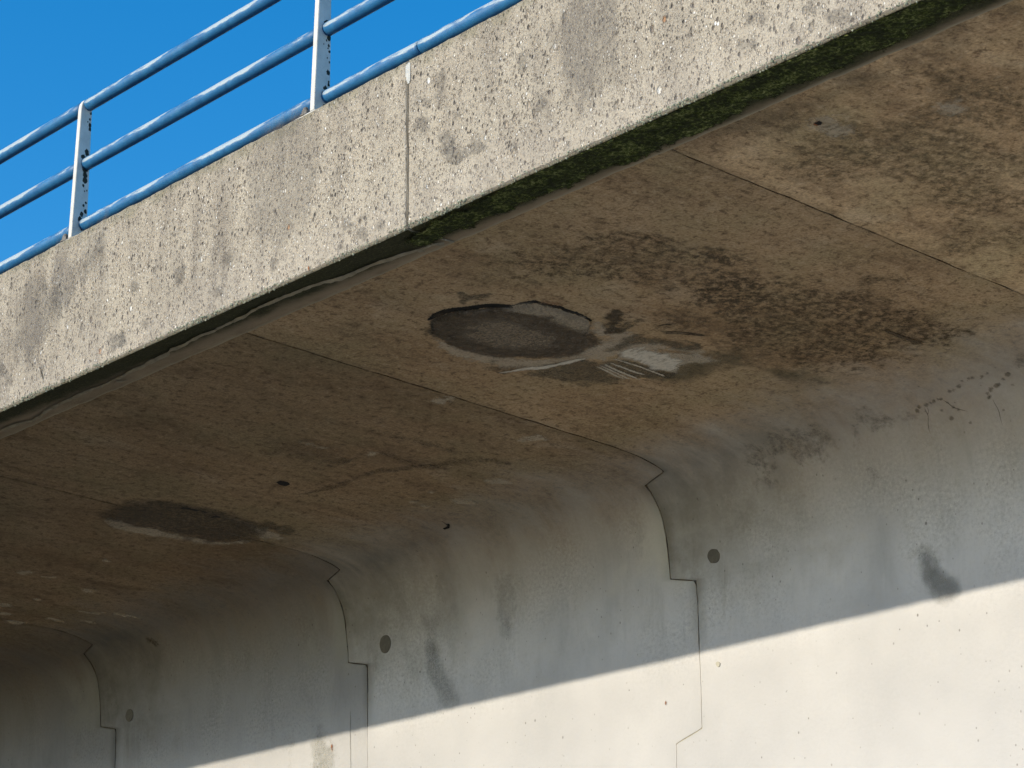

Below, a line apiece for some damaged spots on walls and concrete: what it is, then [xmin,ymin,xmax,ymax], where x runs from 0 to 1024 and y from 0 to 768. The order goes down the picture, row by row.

peeling [427,300,637,386]
water stain [509,231,973,379]
water stain [104,499,294,544]